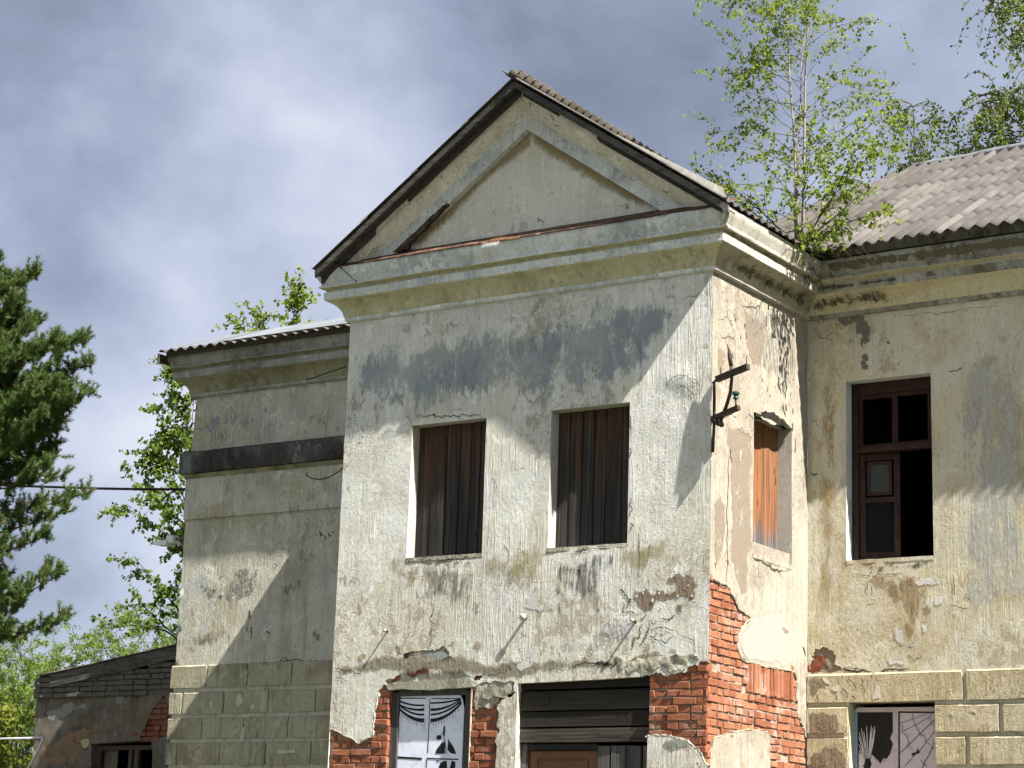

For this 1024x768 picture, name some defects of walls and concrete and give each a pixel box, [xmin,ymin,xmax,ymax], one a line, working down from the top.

water stain [737,265,896,322]
water stain [599,307,671,377]
peeling [838,315,870,370]
crack [406,408,484,423]
water stain [732,298,796,464]
water stain [557,553,613,613]
crack [556,589,696,672]
peeling [563,573,697,651]
spalling [610,421,847,768]
peeling [46,702,87,721]
spalling [132,693,169,746]
spalling [329,642,542,768]